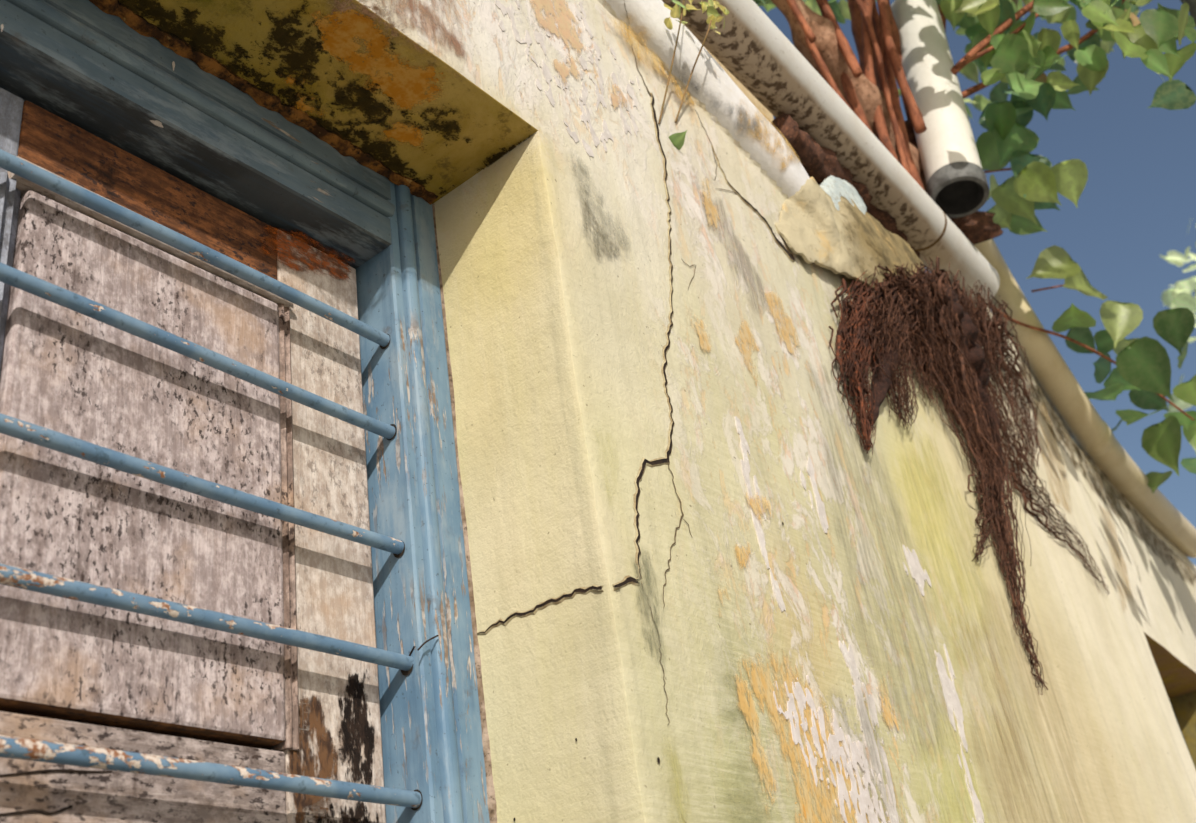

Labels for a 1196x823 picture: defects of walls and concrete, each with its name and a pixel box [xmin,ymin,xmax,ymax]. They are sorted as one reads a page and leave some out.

leakage [117,0,470,198]
leakage [477,135,533,171]
peeling [495,0,640,157]
crack [695,110,795,262]
crack [432,7,696,823]
peeling [734,416,786,612]
peeling [800,457,829,533]
peeling [902,545,931,596]
leakage [287,669,375,785]
leakage [293,793,379,823]
peeling [735,640,899,823]
peeling [934,644,985,823]